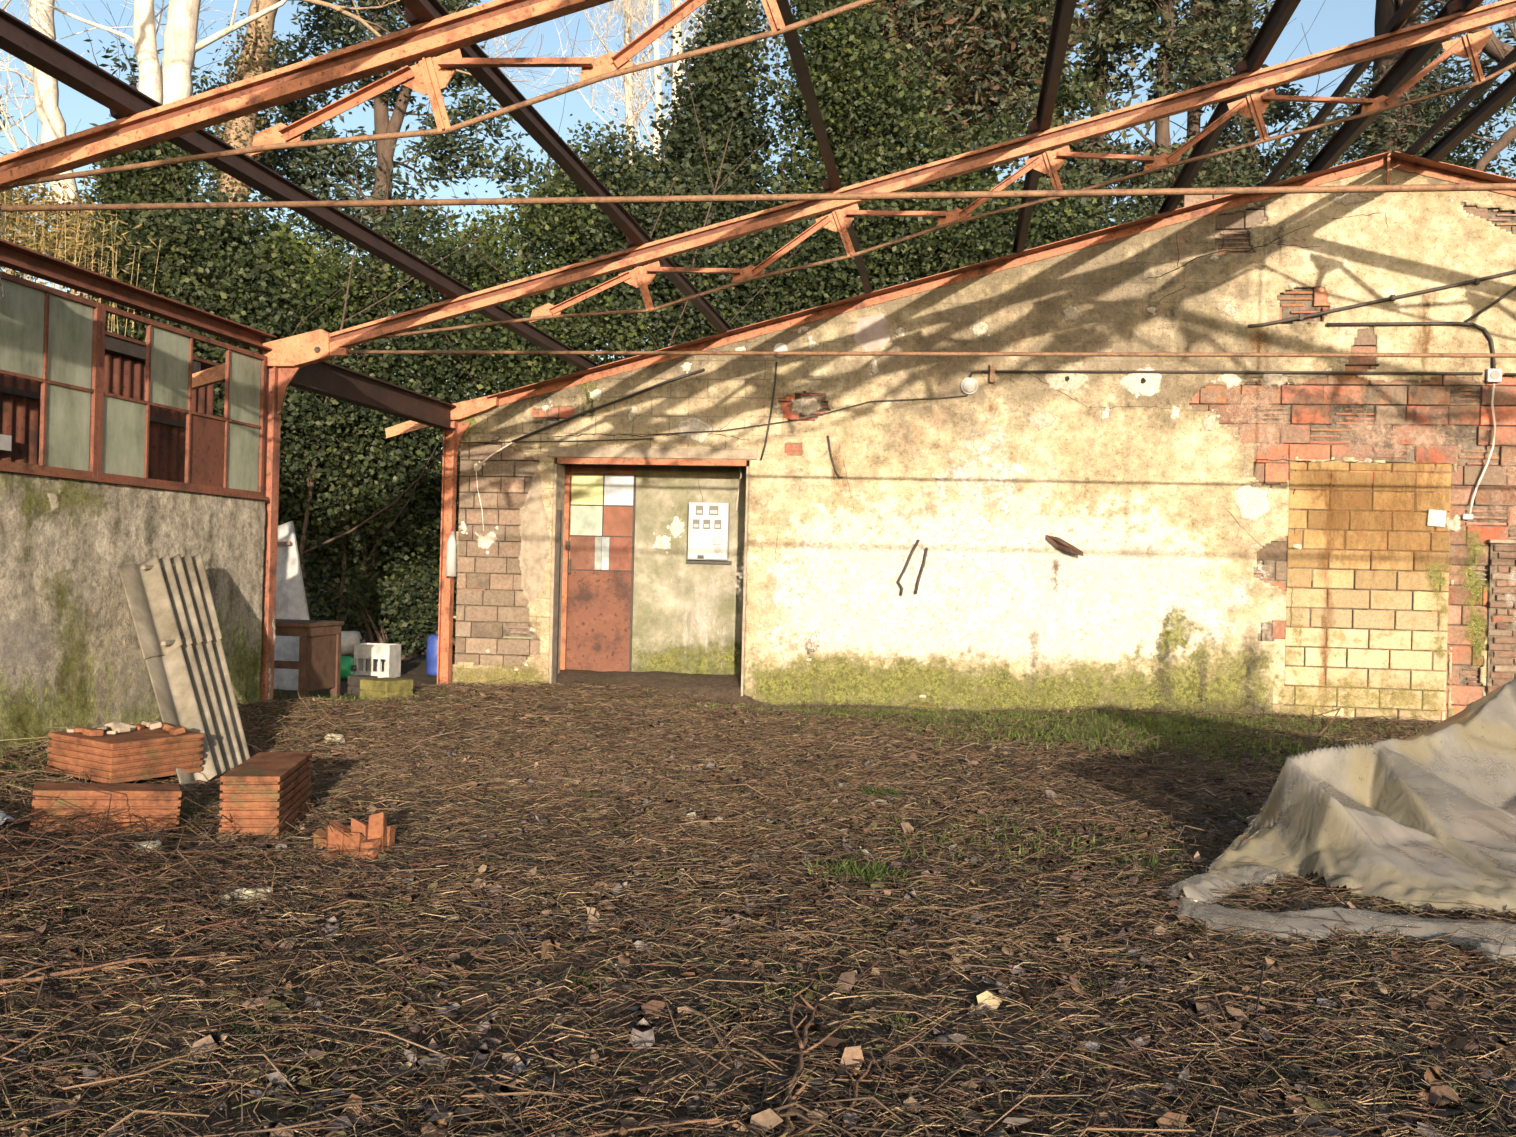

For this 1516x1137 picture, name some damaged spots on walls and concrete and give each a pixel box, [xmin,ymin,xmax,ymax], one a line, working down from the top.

spalling [1448,199,1516,234]
spalling [1271,282,1338,324]
spalling [775,384,828,456]
spalling [455,437,546,671]
spalling [1172,327,1516,720]